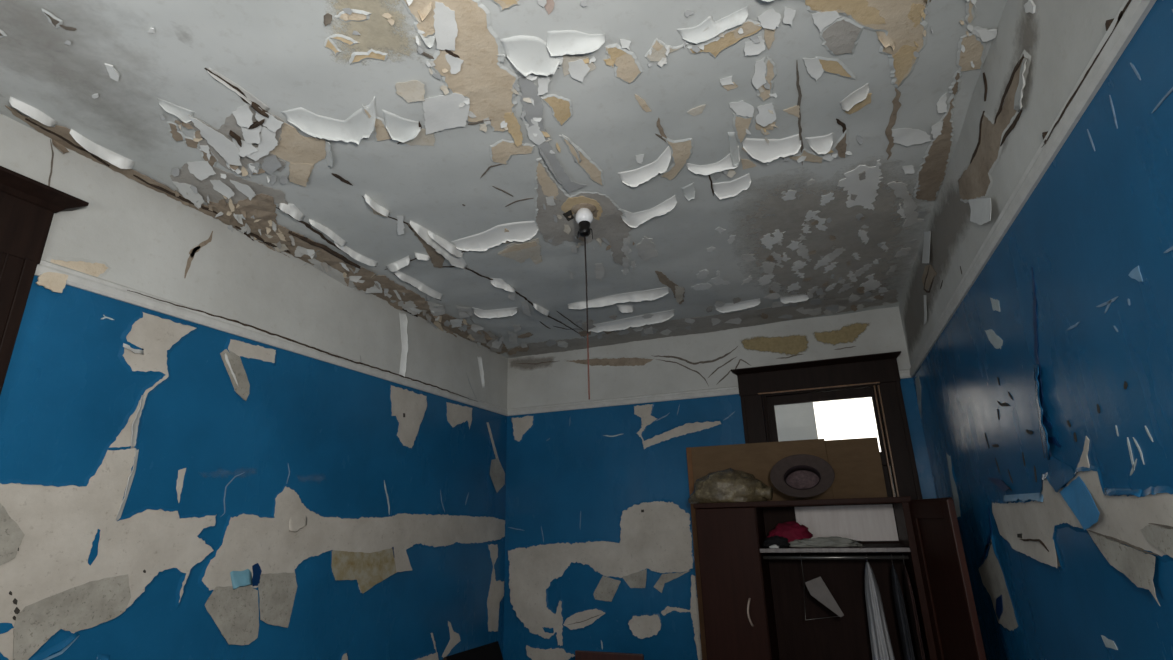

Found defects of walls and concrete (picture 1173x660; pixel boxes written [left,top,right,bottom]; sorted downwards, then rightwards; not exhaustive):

peeling [1024,0,1036,14]
peeling [5,0,1032,388]
crack [127,231,478,402]